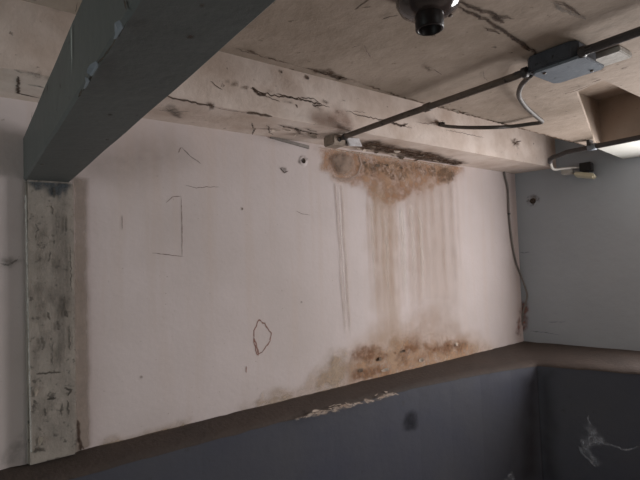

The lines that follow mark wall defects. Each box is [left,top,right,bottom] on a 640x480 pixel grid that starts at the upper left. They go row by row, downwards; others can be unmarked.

crack [458,2,536,55]
crack [168,87,328,138]
crack [346,111,478,137]
spalling [320,141,462,180]
water stain [323,149,459,203]
peeling [301,391,398,418]